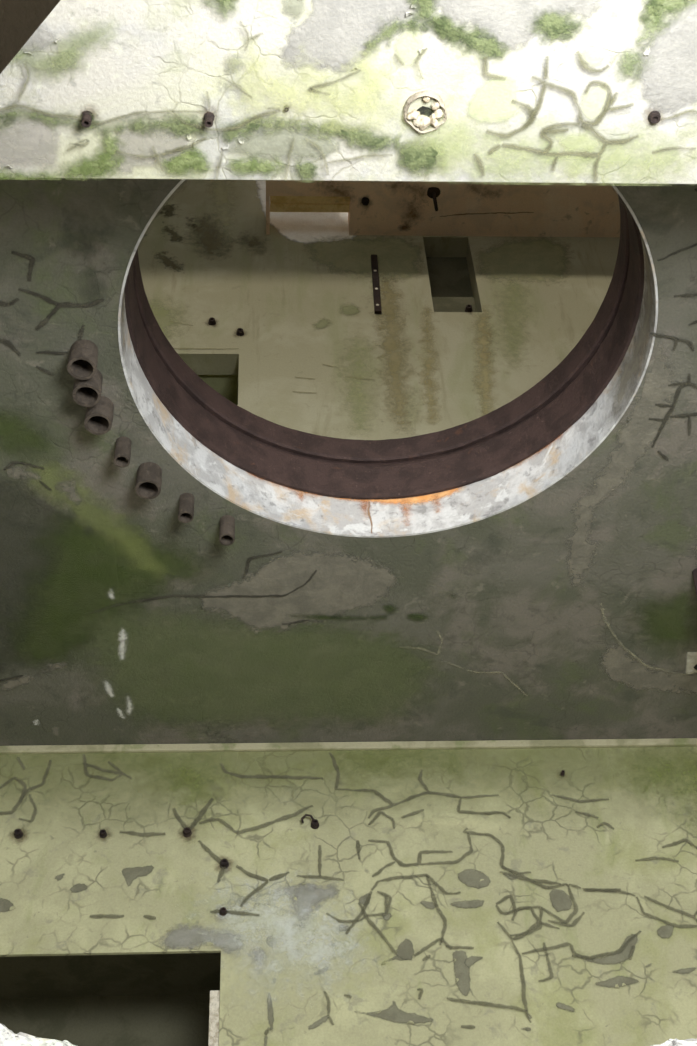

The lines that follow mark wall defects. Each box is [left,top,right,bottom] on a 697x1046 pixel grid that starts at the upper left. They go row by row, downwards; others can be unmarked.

peeling [283,0,426,73]
peeling [433,0,601,49]
peeling [637,0,697,112]
crack [0,64,280,177]
crack [474,51,697,181]
crack [0,251,104,376]
crack [649,294,697,461]
corrosion [340,488,458,514]
leakage [0,483,427,725]
crack [90,912,156,920]
crack [119,798,344,916]
crack [220,752,697,1028]